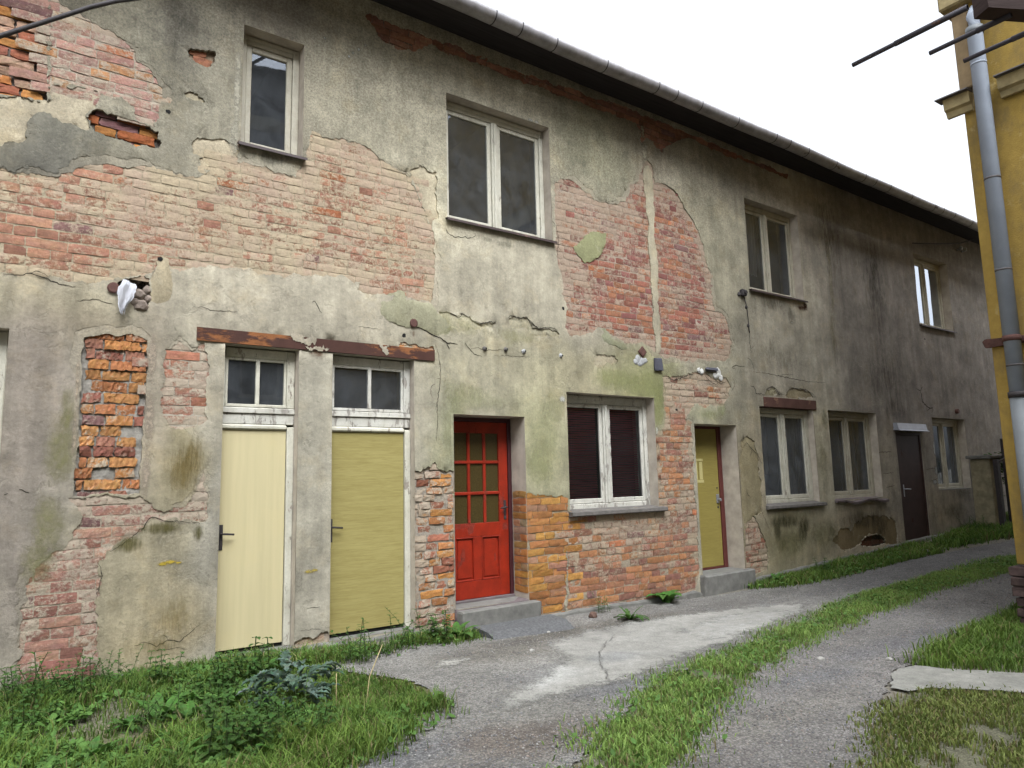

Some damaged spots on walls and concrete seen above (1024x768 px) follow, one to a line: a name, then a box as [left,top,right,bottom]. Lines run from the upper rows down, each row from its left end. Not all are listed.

flaking render [0,0,494,355]
flaking render [365,13,788,179]
crack [417,314,556,442]
flaking render [509,160,734,615]
flaking render [12,325,211,685]
spalling [412,463,455,630]
flaking render [738,436,769,574]
flaking render [832,515,897,551]